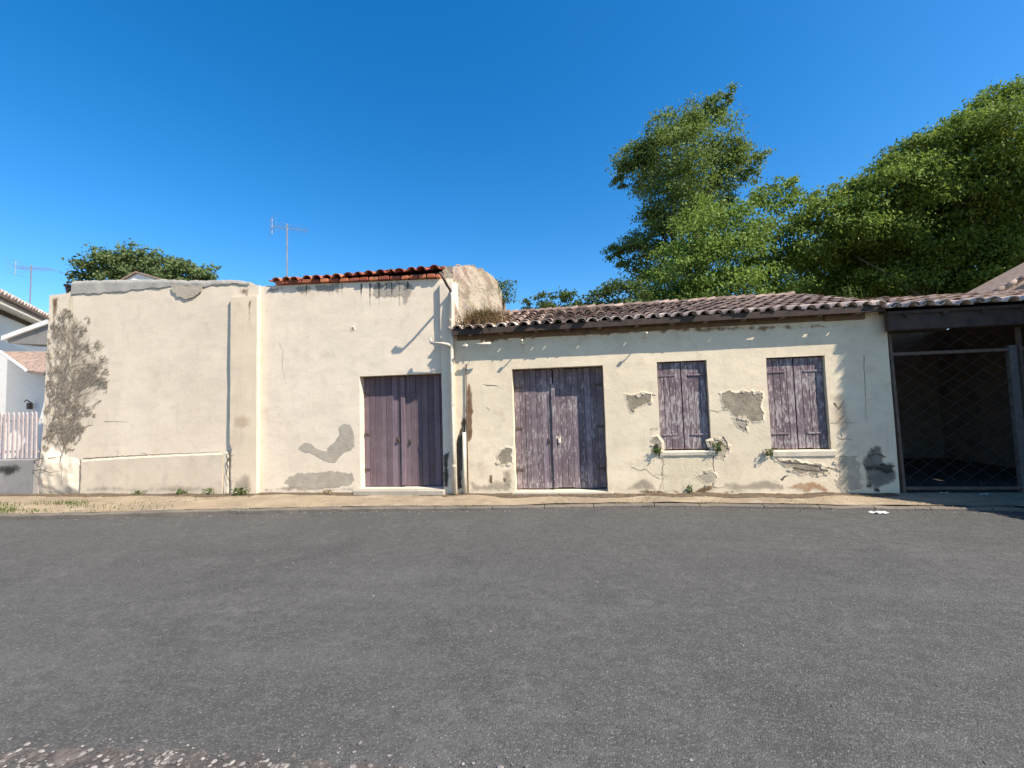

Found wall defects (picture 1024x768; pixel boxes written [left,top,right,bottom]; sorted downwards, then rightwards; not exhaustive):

water stain [361,282,412,304]
spalling [623,391,653,415]
spalling [719,388,766,432]
spalling [495,445,515,467]
spalling [771,452,867,493]
water stain [863,447,895,492]